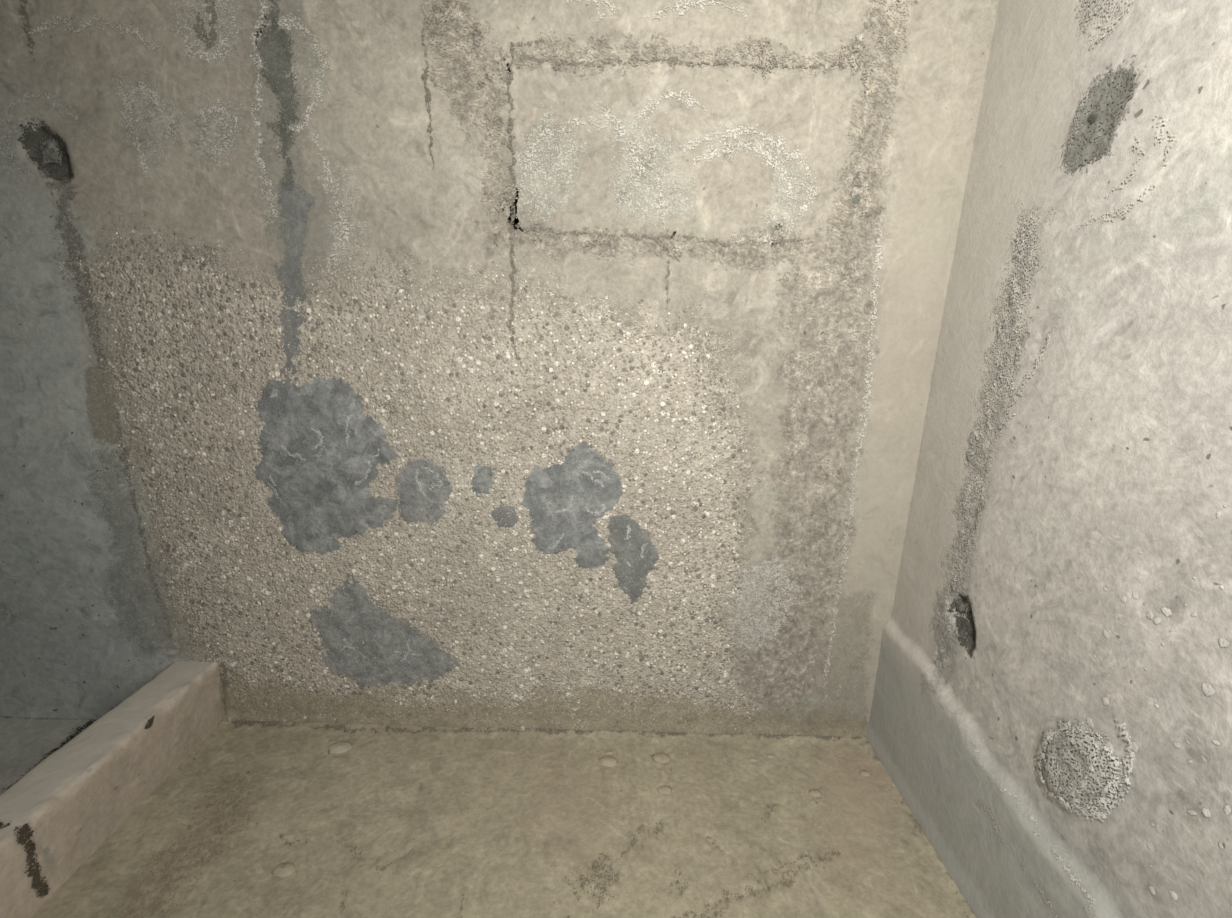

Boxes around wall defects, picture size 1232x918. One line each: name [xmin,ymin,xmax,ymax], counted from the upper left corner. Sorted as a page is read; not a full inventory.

water stain [231,0,336,396]
spalling [17,0,918,735]
crack [506,39,847,369]
peeling [920,198,1060,695]
spalling [1058,54,1146,174]
crack [0,822,57,898]
crack [145,715,155,729]